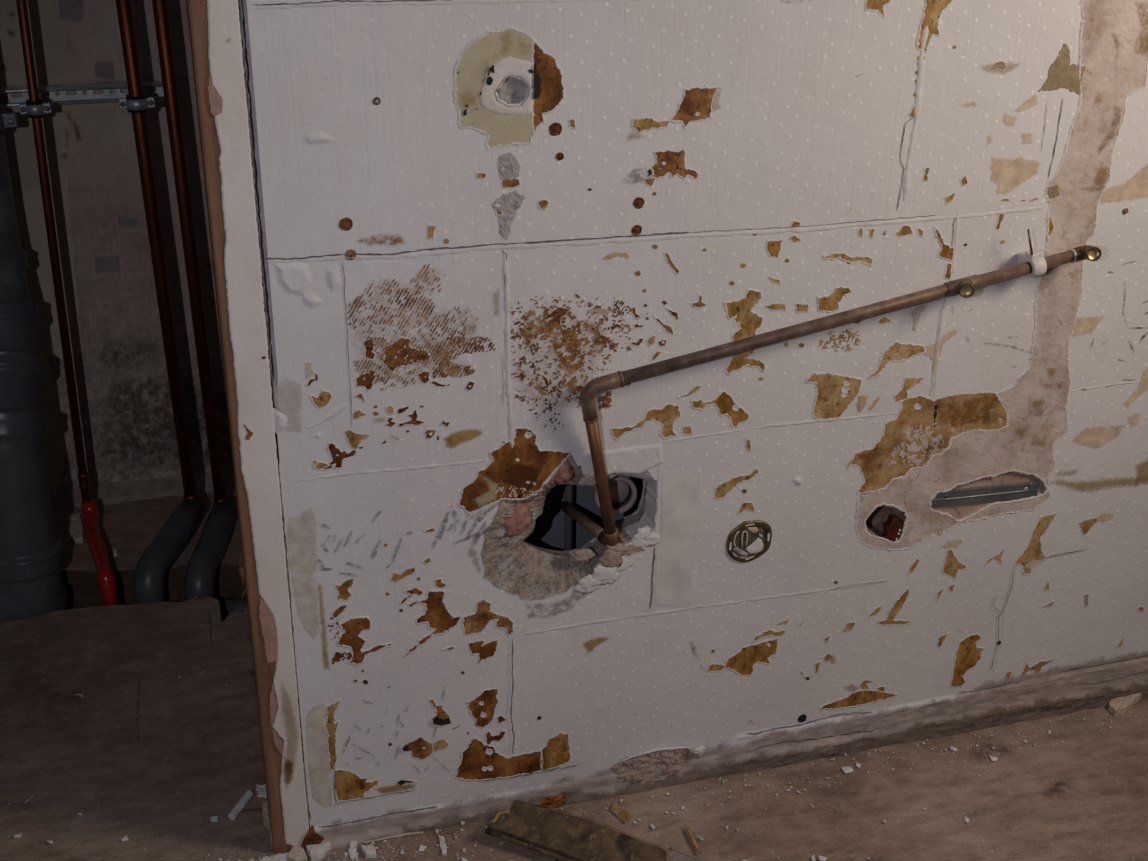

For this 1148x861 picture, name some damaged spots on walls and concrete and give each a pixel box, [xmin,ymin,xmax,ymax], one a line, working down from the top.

peeling [452,26,566,240]
peeling [631,84,722,137]
rust [348,264,495,392]
rust [495,294,648,432]
peeling [723,276,852,381]
flaking render [799,0,1148,680]
peeling [609,384,752,453]
spalling [457,426,660,617]
peeling [319,577,393,684]
peeling [386,556,516,664]
peeling [706,618,802,677]
peeling [389,688,572,782]